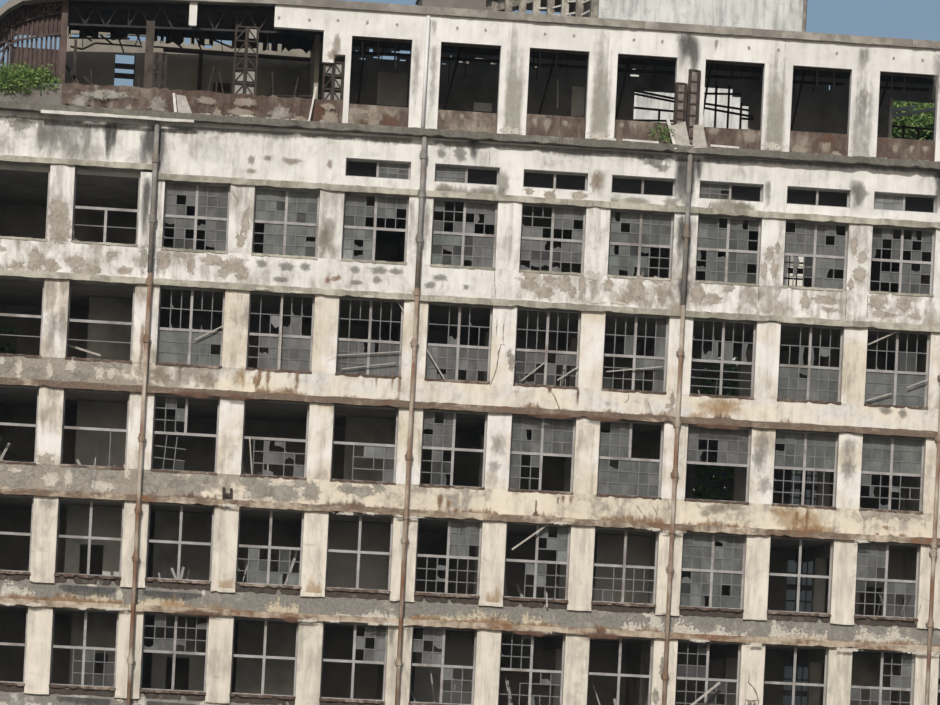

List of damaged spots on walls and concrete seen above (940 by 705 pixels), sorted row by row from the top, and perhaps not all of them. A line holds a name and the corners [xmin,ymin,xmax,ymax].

leakage [680,35,698,69]
leakage [435,71,940,205]
peeling [6,247,101,275]
peeling [118,209,250,280]
peeling [520,271,671,305]
crack [490,319,504,385]
rust [229,370,302,400]
peeling [0,453,131,493]
peeling [218,475,320,508]
rust [438,495,498,514]
rust [601,516,664,524]
peeling [265,597,559,634]